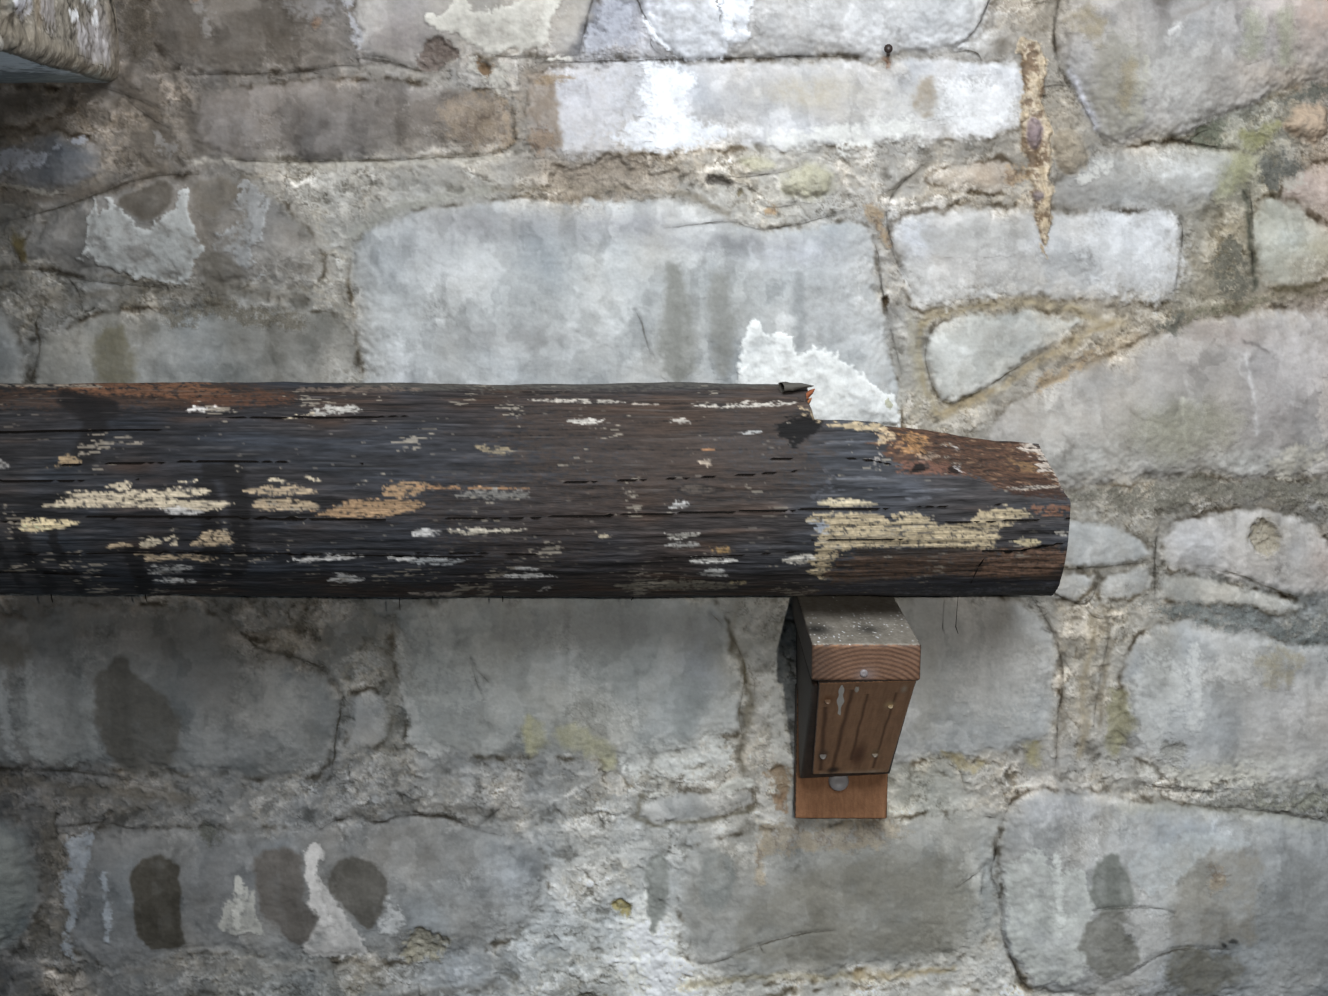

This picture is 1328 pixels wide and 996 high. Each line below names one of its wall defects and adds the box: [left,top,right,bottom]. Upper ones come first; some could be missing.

peeling [735,317,901,428]
water stain [1067,372,1328,519]
water stain [0,636,185,777]
water stain [695,592,1328,996]
water stain [216,841,407,963]